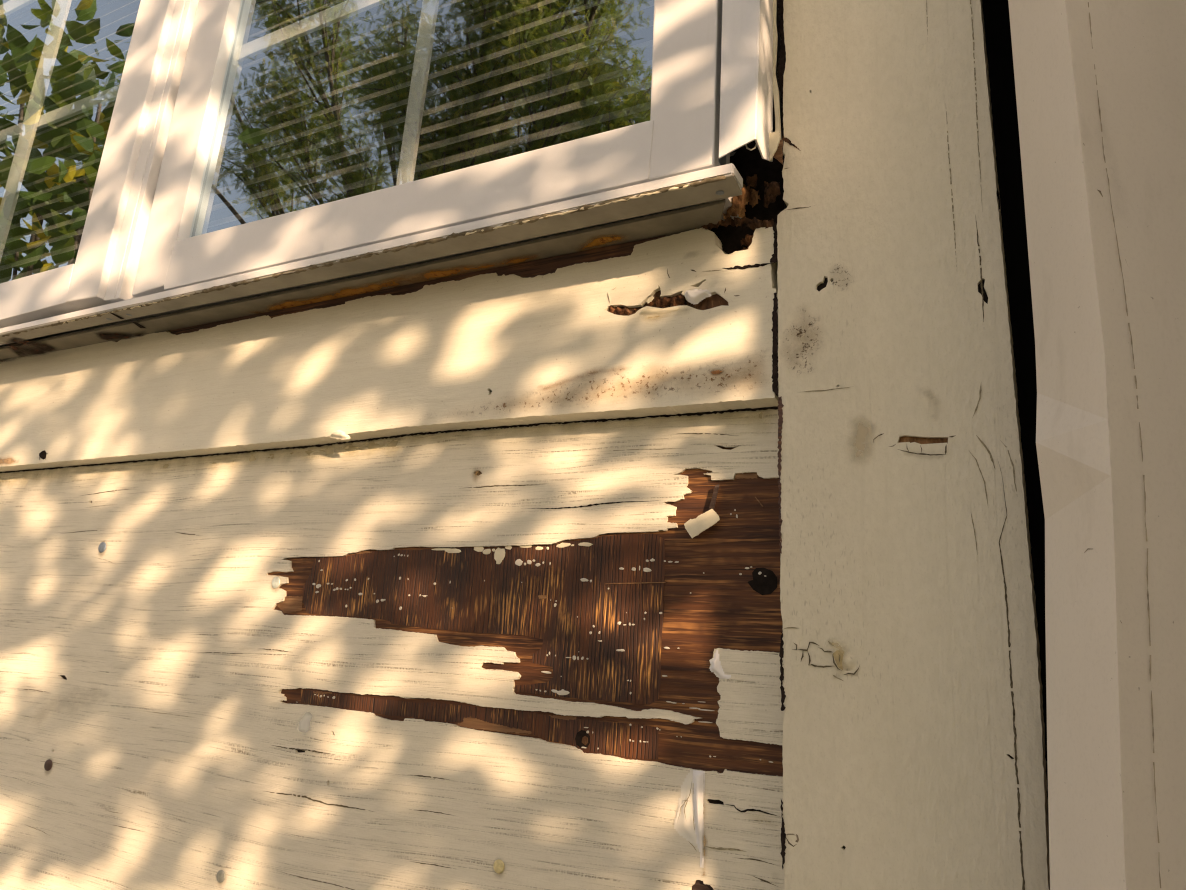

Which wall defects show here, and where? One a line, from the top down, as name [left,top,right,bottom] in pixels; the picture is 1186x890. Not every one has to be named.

spalling [695,136,799,254]
rust [255,278,404,313]
peeling [166,235,666,335]
spalling [608,285,729,316]
damp [494,360,762,410]
peeling [268,469,783,890]
crack [272,745,335,755]
crack [265,791,374,812]
crack [705,800,787,887]